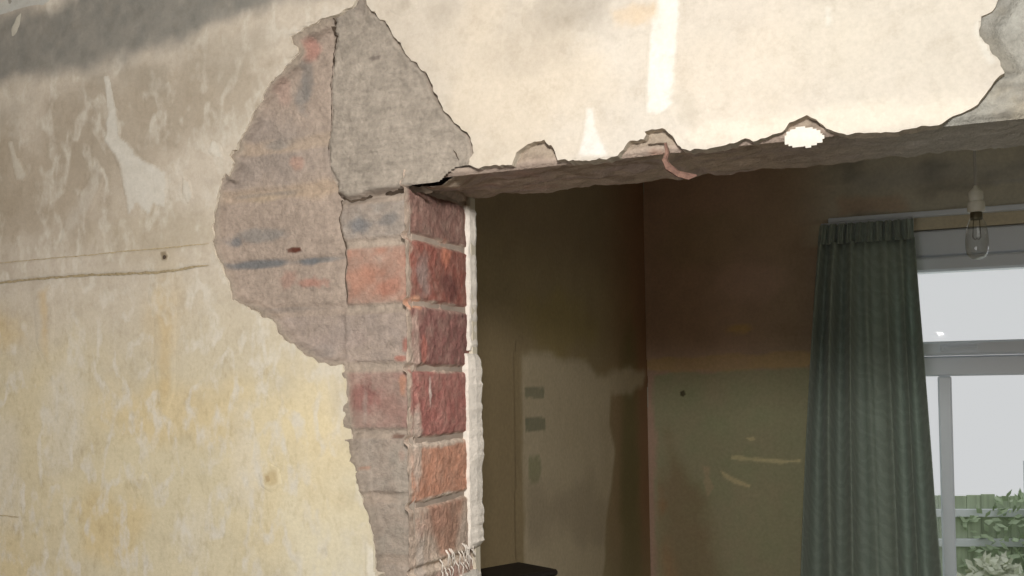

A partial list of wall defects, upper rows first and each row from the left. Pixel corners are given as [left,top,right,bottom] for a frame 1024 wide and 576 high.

water stain [0,0,352,168]
crack [328,18,338,161]
crack [338,186,433,298]
spalling [213,0,1024,576]